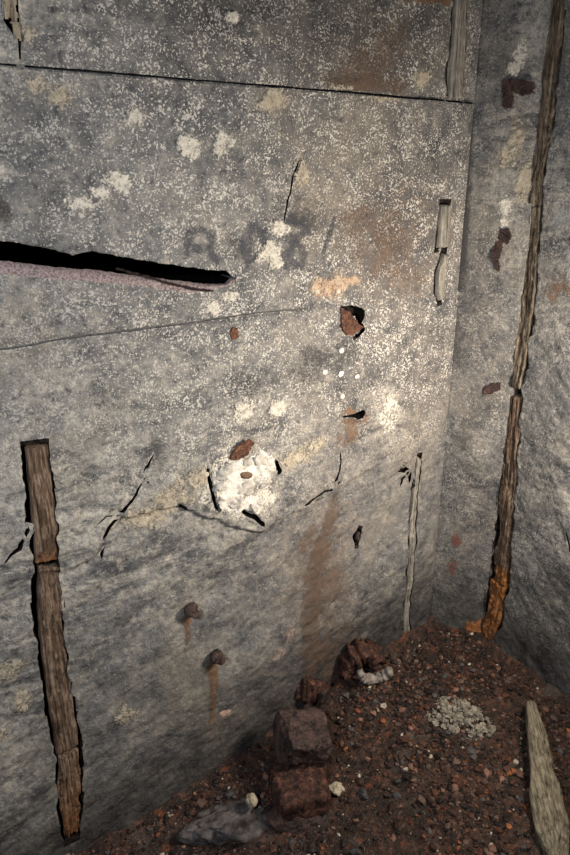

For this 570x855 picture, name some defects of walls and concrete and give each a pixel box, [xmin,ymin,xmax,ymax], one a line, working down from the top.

crack [431,199,454,307]
rust [491,228,512,271]
rust [340,308,364,335]
crack [176,462,268,530]
spalling [197,439,279,523]
crack [272,455,285,479]
crack [300,448,343,509]
crack [0,438,159,847]